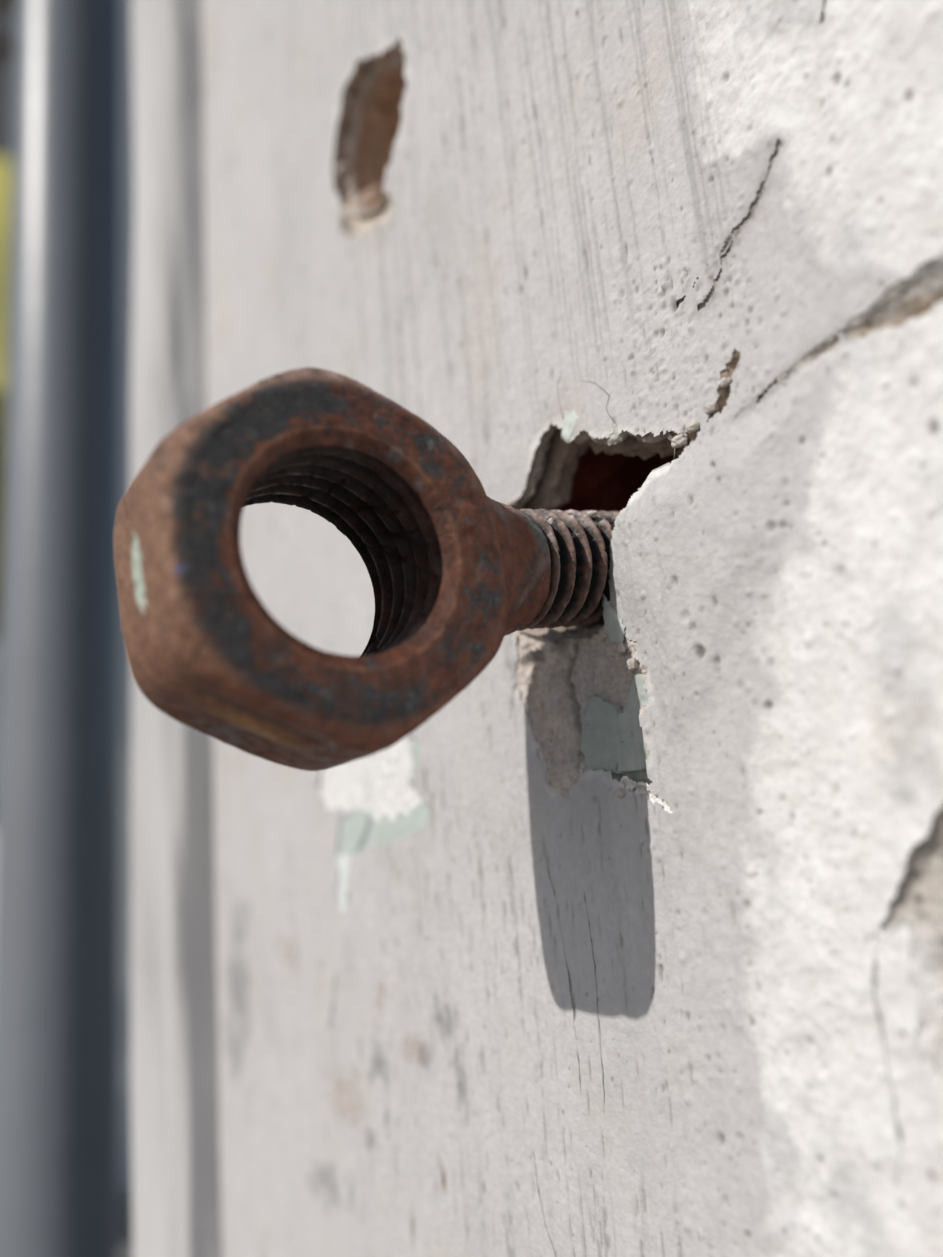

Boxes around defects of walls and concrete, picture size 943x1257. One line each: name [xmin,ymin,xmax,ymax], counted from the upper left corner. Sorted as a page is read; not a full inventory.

spalling [340,190,392,239]
crack [675,138,783,311]
spalling [507,348,741,518]
crack [756,332,845,404]
flaking render [510,593,672,814]
flaking render [880,804,943,1091]